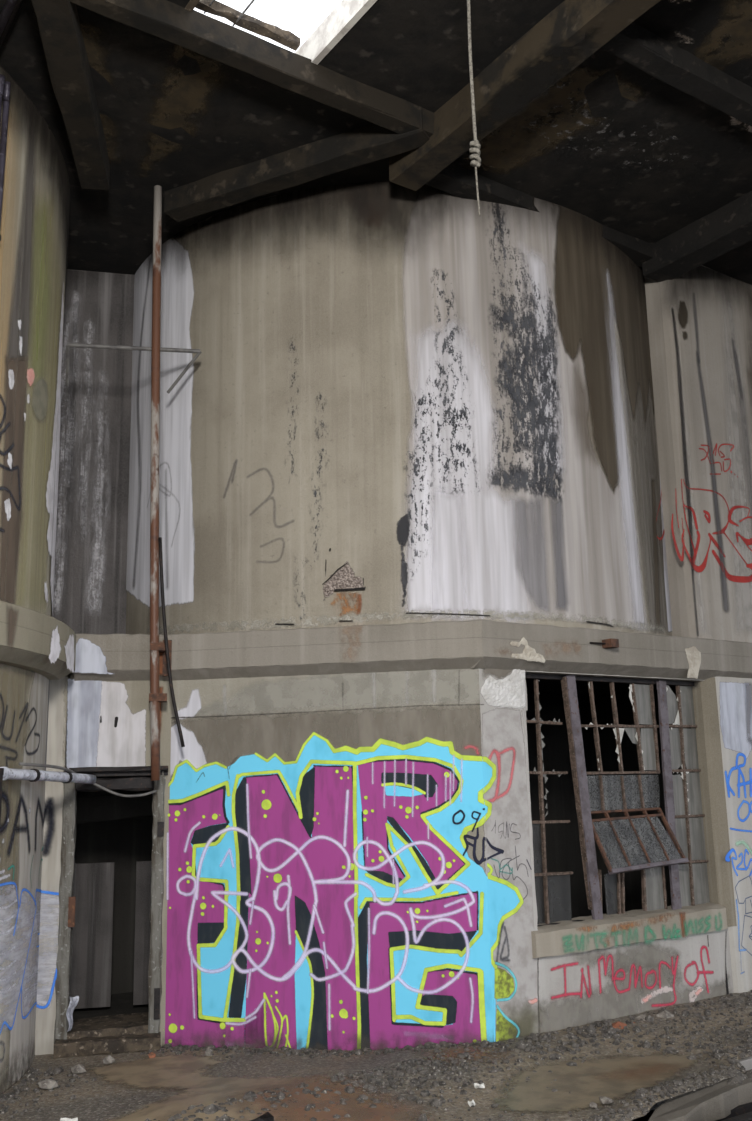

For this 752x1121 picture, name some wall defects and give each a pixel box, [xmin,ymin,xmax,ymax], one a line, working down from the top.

leakage [141,45,223,176]
peeling [468,32,594,143]
leakage [466,68,686,173]
leakage [694,0,752,65]
leakage [0,133,103,646]
leakage [148,185,672,634]
peeling [685,646,701,679]
peeling [8,627,146,1082]
peeling [480,637,545,1039]
peeling [641,986,673,1004]
peeling [689,986,704,1002]